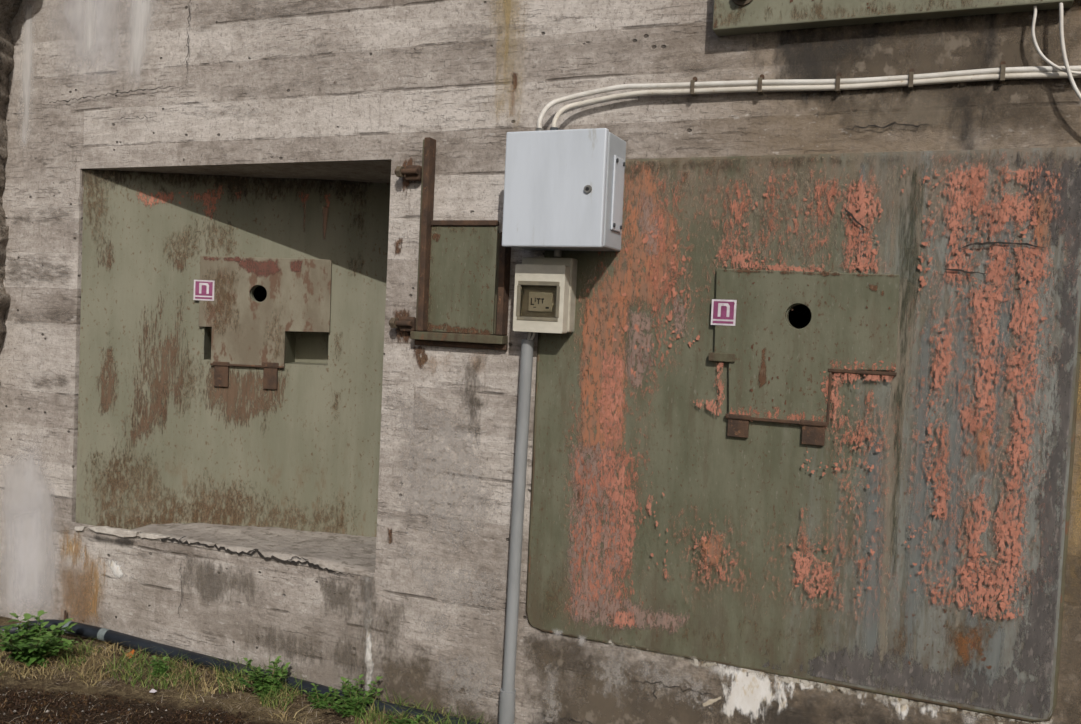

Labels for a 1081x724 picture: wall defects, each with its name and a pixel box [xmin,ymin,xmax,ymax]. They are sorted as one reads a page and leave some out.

rust [92,291,347,533]
rust [82,168,372,272]
rust [402,158,413,193]
peeling [566,163,898,634]
leakage [941,298,968,574]
peeling [904,155,1066,621]
leakage [994,218,1014,431]
crack [137,536,354,616]
leakage [529,639,965,724]
leakage [966,608,1004,690]